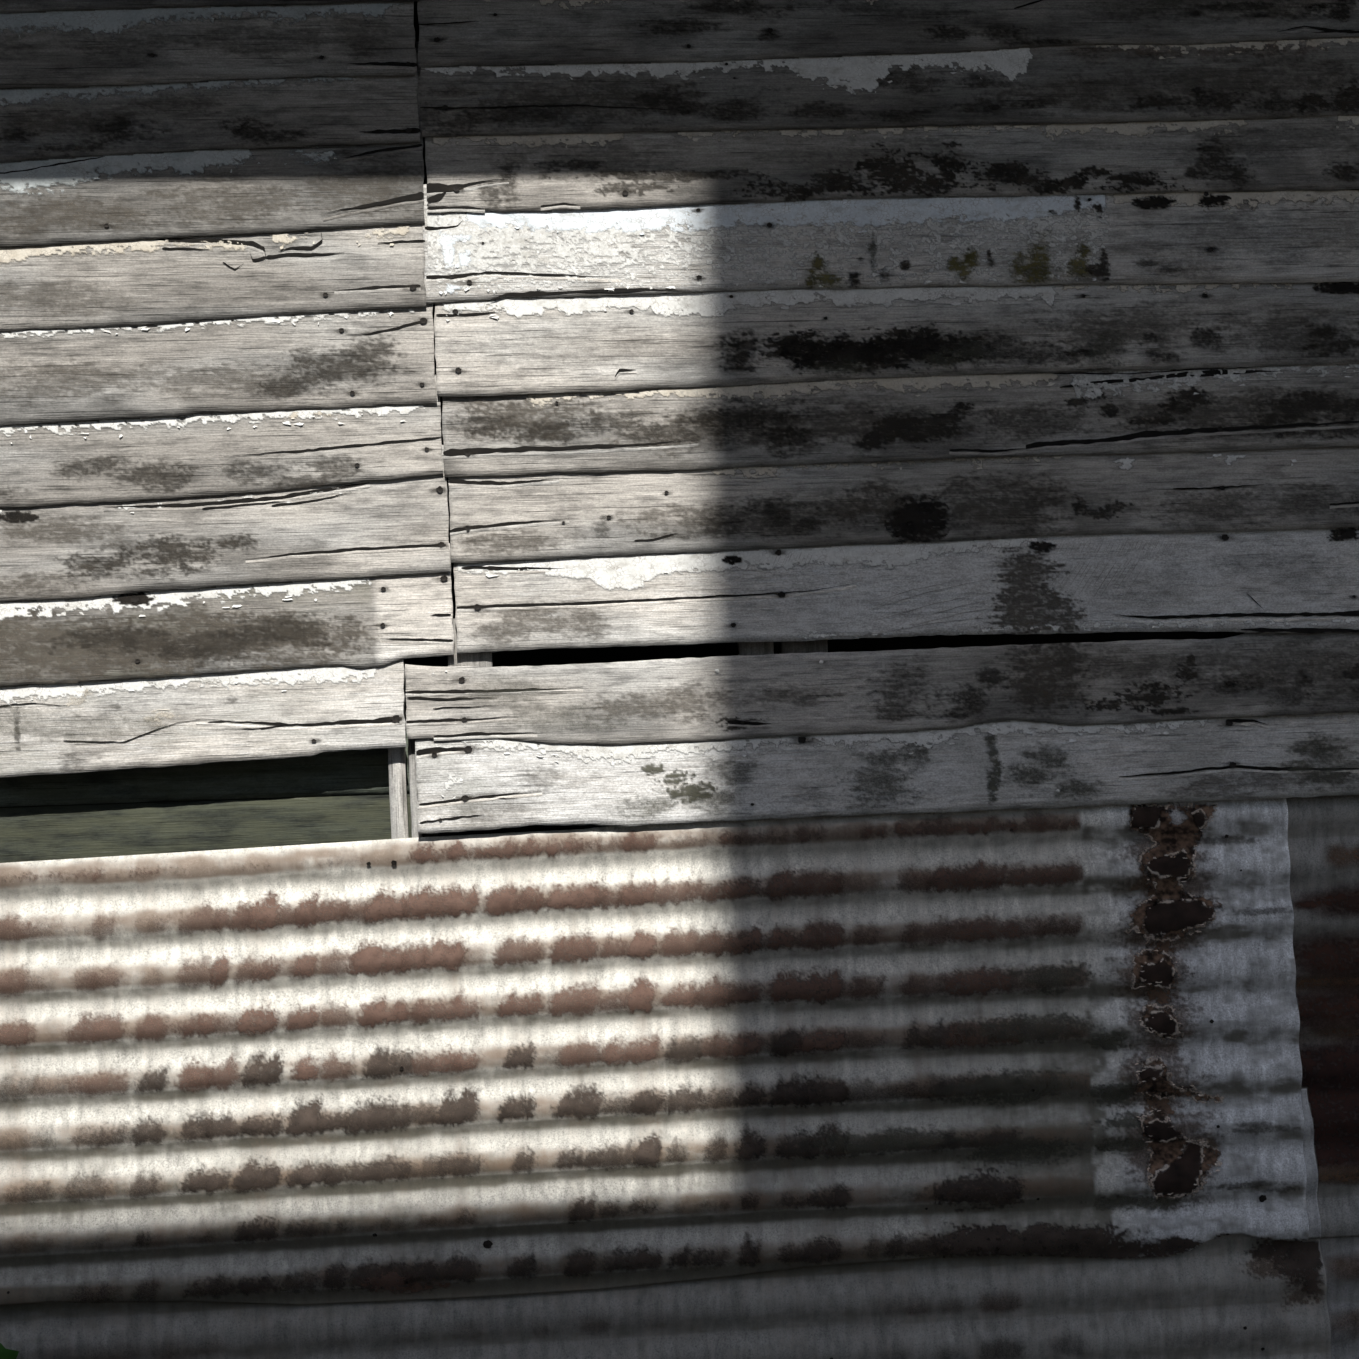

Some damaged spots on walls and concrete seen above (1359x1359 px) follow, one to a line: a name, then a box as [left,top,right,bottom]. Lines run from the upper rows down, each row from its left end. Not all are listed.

peeling [421,47,1033,94]
water stain [540,138,1255,218]
crack [156,179,509,270]
peeling [426,190,1359,321]
crack [334,271,694,335]
water stain [720,295,1222,375]
peeling [457,538,1038,591]
water stain [638,471,1359,721]
crack [64,687,583,759]
rust [179,869,843,932]
rust [1293,933,1359,1184]
rust [74,1088,479,1146]